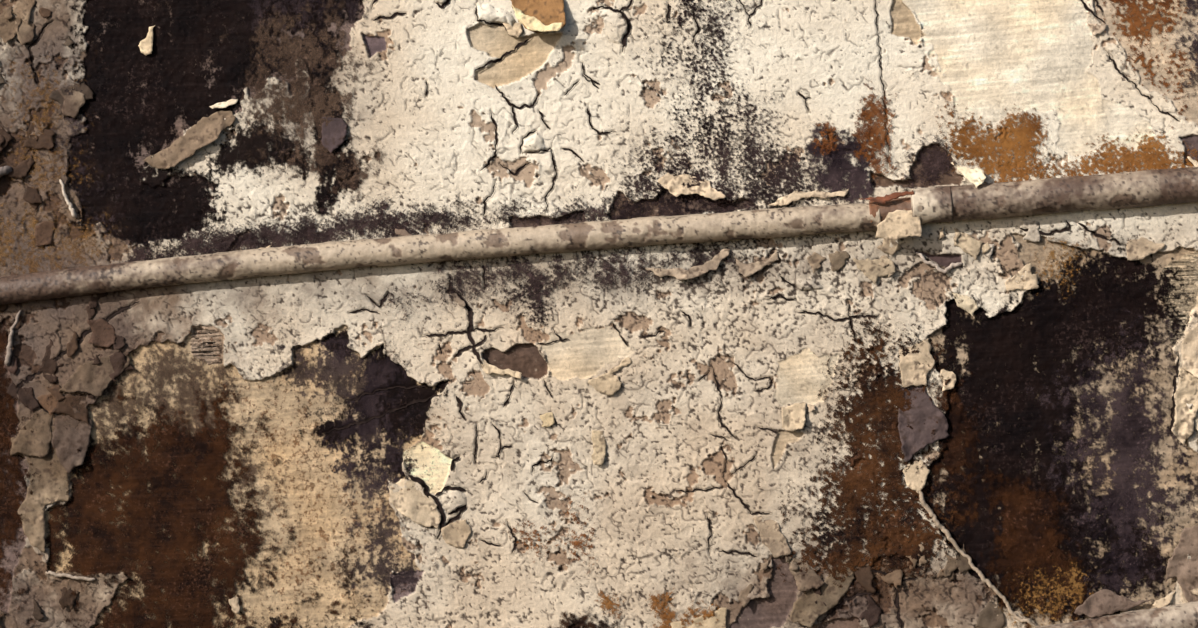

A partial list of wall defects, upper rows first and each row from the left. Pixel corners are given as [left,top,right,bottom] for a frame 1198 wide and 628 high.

peeling [126,0,387,213]
leakage [38,0,883,262]
crack [436,0,616,215]
corrosion [812,121,838,156]
corrosion [851,81,904,182]
corrosion [935,0,1198,183]
crack [423,265,504,367]
peeling [0,304,471,628]
crack [323,383,554,539]
crack [676,363,778,557]
peeling [670,219,1198,628]
leakage [224,616,327,628]